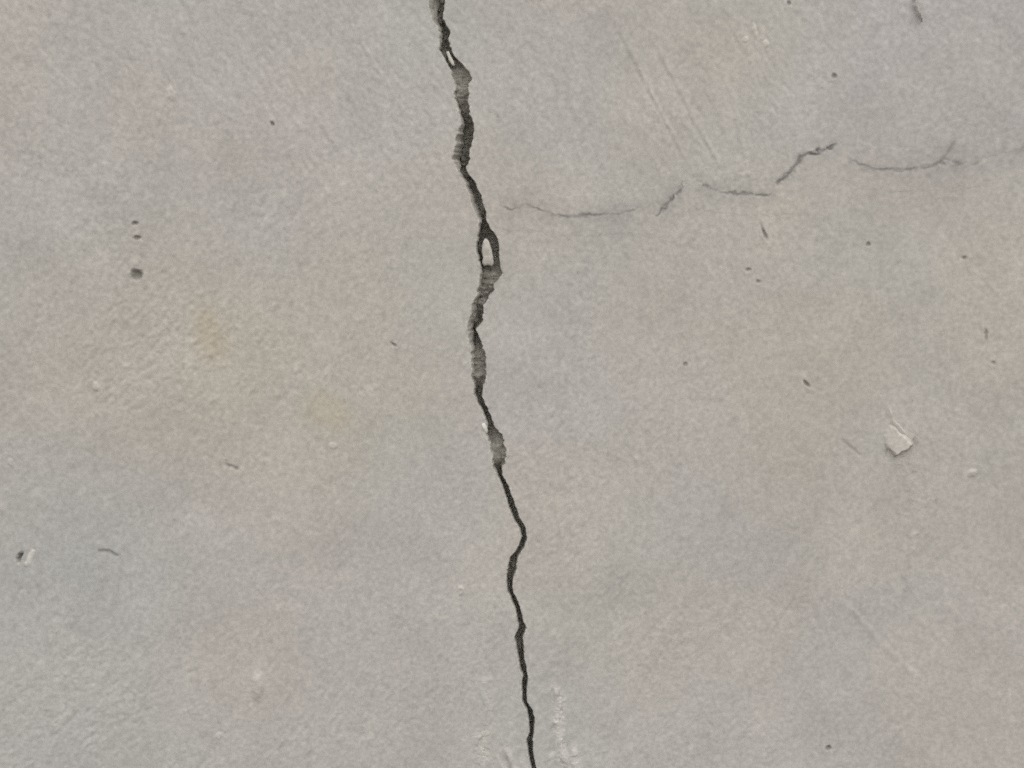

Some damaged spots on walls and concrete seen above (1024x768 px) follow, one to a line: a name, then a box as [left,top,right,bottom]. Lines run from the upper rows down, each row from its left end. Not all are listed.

crack [426,0,1024,768]